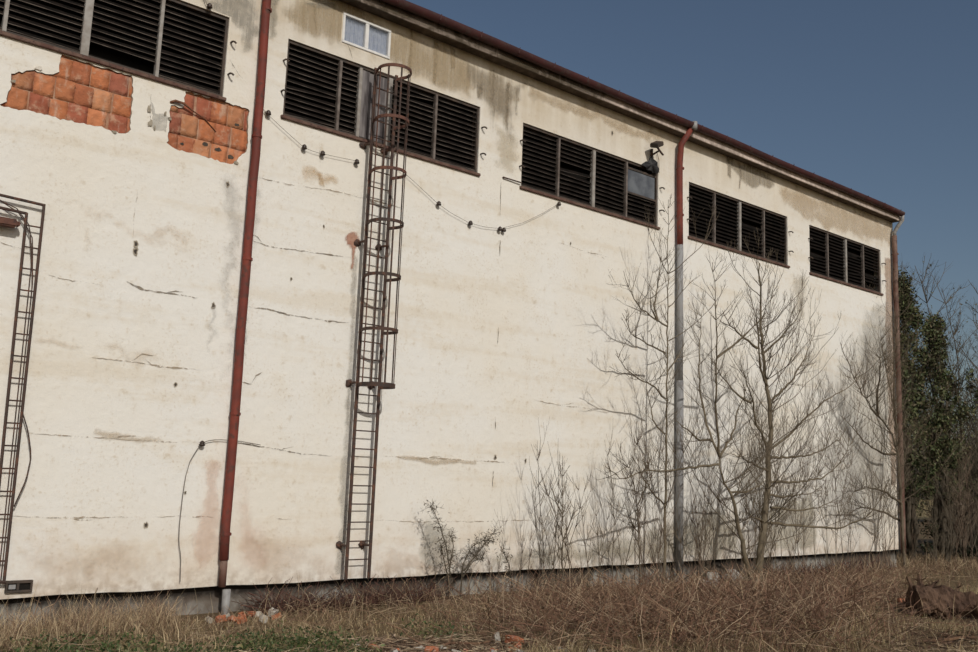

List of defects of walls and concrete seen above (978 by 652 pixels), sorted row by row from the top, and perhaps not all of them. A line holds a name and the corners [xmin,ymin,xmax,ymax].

flaking render [0,54,133,134]
flaking render [164,92,249,165]
corrosion [346,232,358,268]